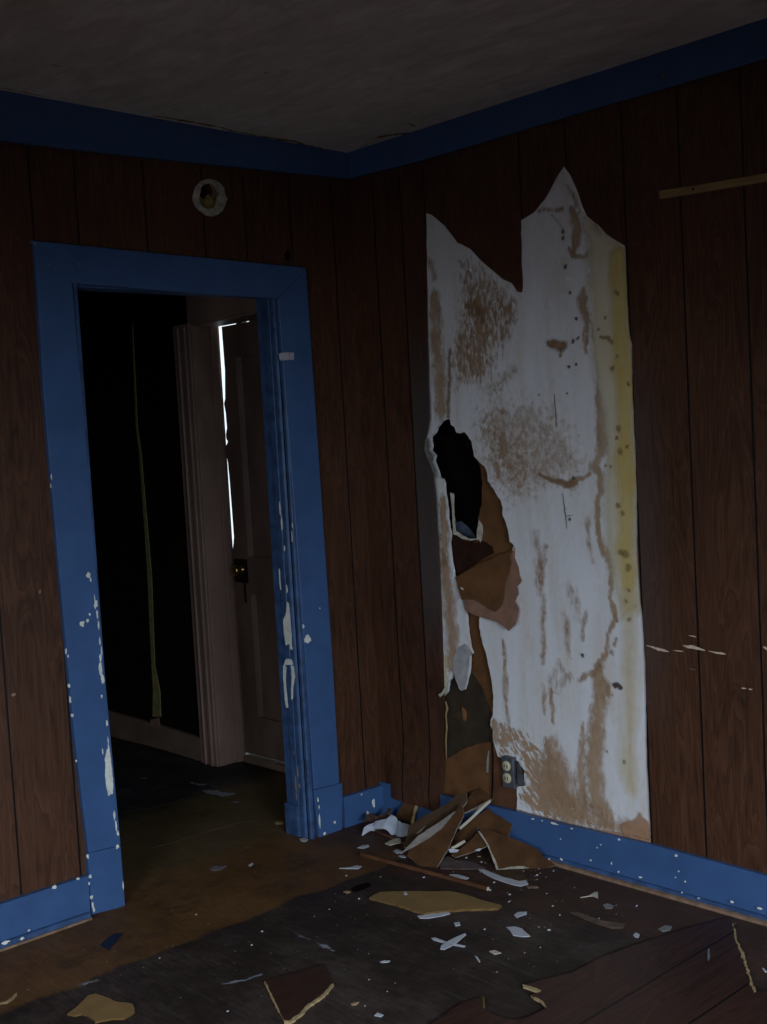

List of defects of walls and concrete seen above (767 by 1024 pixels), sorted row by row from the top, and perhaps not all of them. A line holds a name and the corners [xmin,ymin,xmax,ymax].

damp [430,259,514,418]
damp [492,193,639,833]
peeling [79,595,105,698]
peeling [279,569,311,708]
spalling [424,419,524,810]